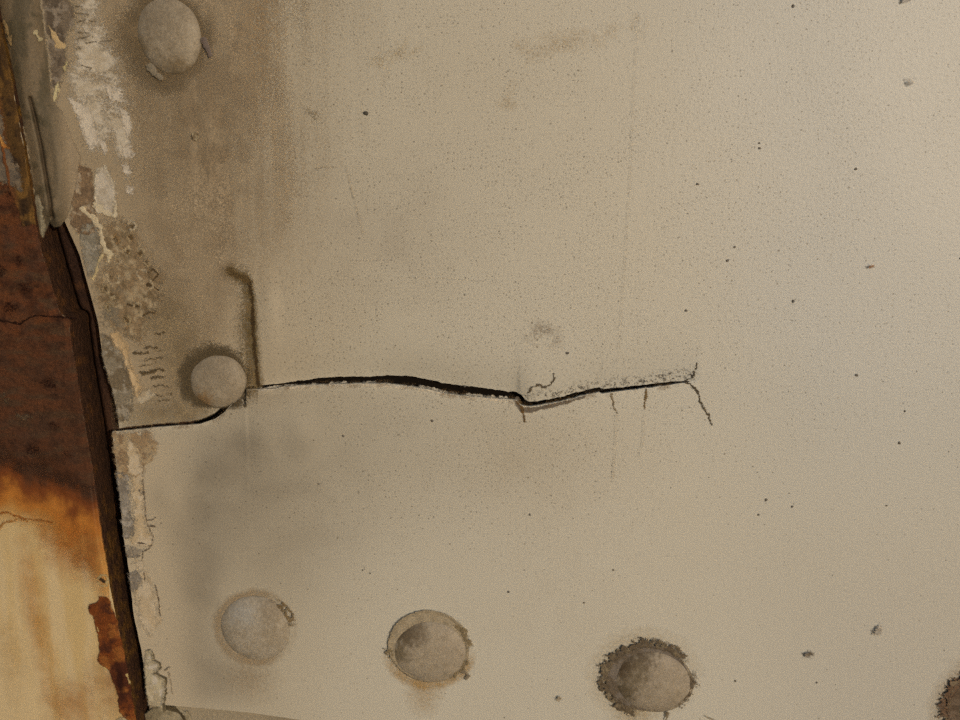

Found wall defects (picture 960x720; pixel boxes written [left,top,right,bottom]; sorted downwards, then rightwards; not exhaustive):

peeling [33,0,172,422]
rust [0,181,136,720]
peeling [112,431,161,637]
crack [194,407,228,423]
crack [224,266,713,425]
peeling [144,649,173,712]